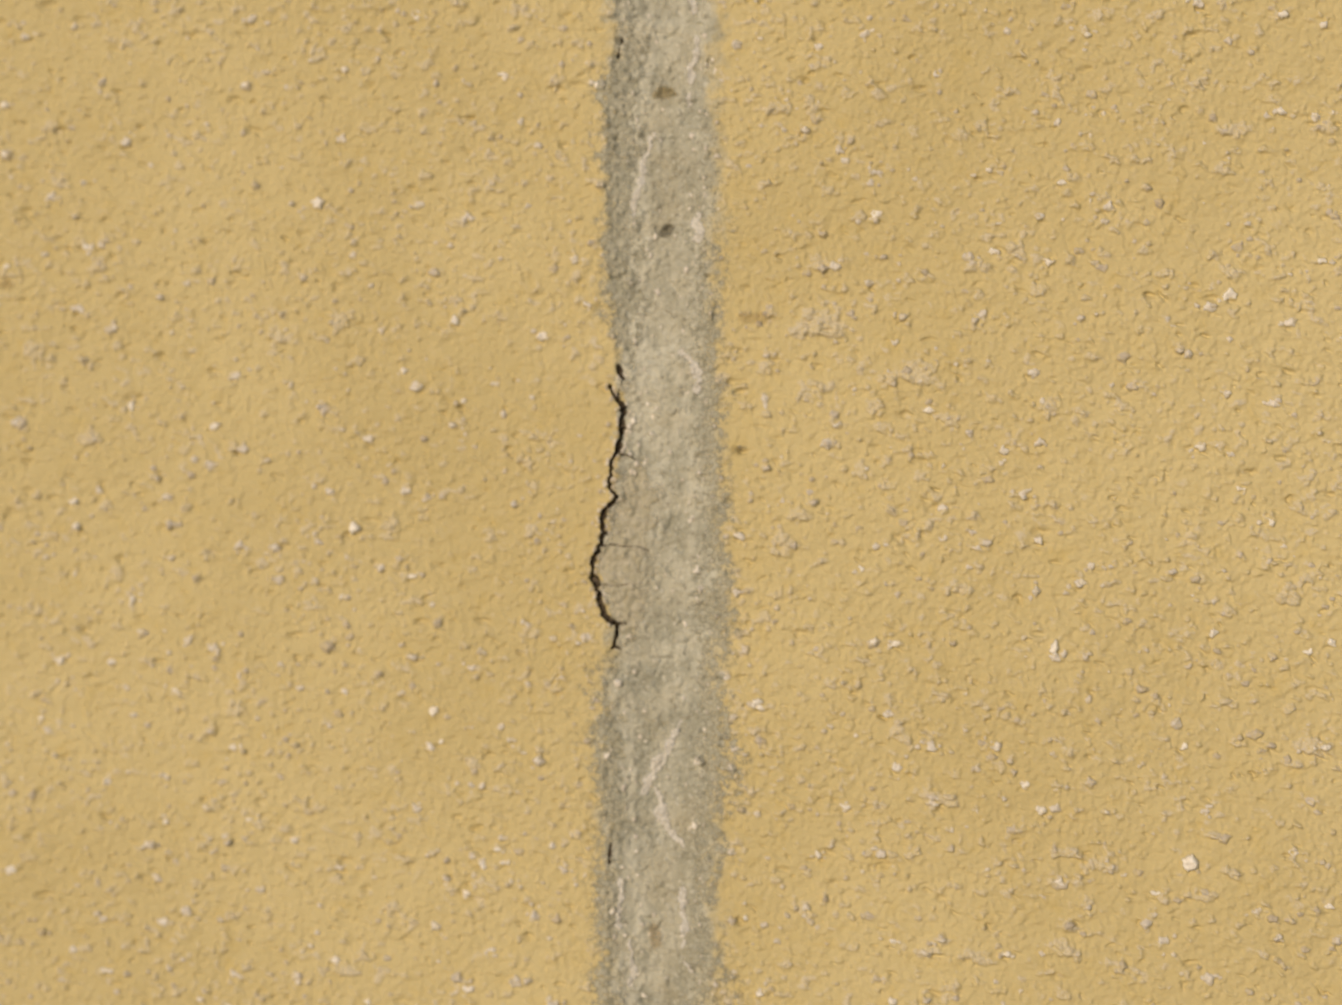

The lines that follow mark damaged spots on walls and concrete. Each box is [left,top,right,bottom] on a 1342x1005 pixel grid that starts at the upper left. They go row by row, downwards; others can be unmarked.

crack [590,366,649,650]